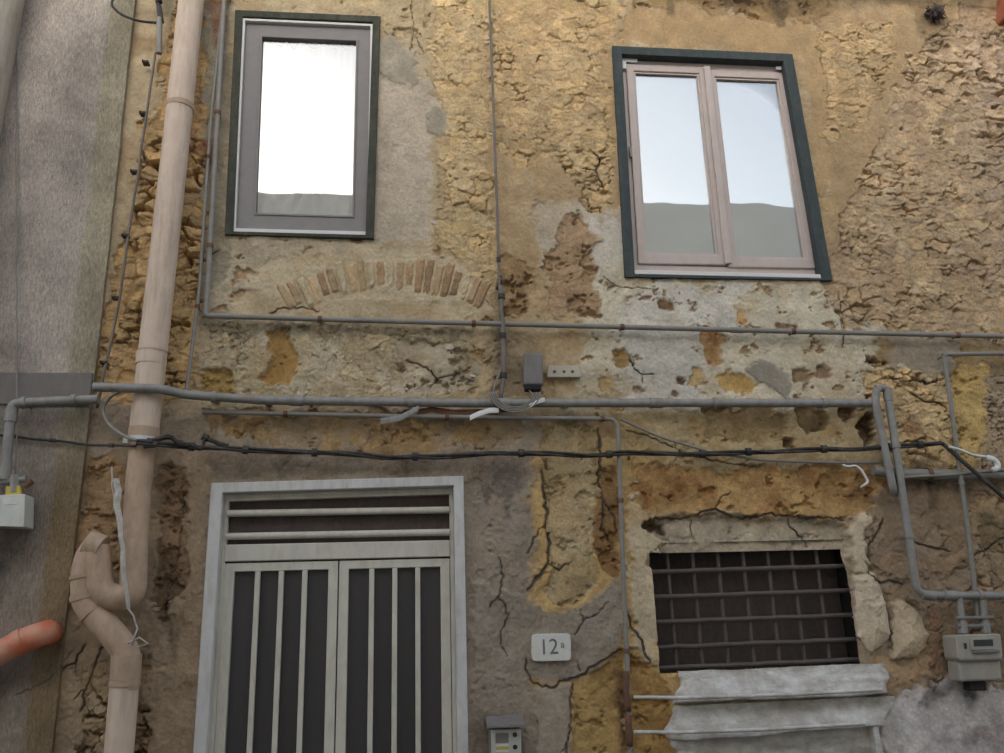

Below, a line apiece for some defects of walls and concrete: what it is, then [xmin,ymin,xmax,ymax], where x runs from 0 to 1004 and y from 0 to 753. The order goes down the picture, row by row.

flaking render [94,0,178,405]
flaking render [162,0,526,462]
flaking render [244,0,1004,346]
crack [527,473,567,590]
flaking render [539,420,627,608]
crack [596,431,617,543]
crack [644,493,844,547]
flaking render [628,357,1004,536]
crack [489,557,508,647]
crack [13,643,104,711]
crack [524,614,651,753]
flaking render [571,650,675,753]